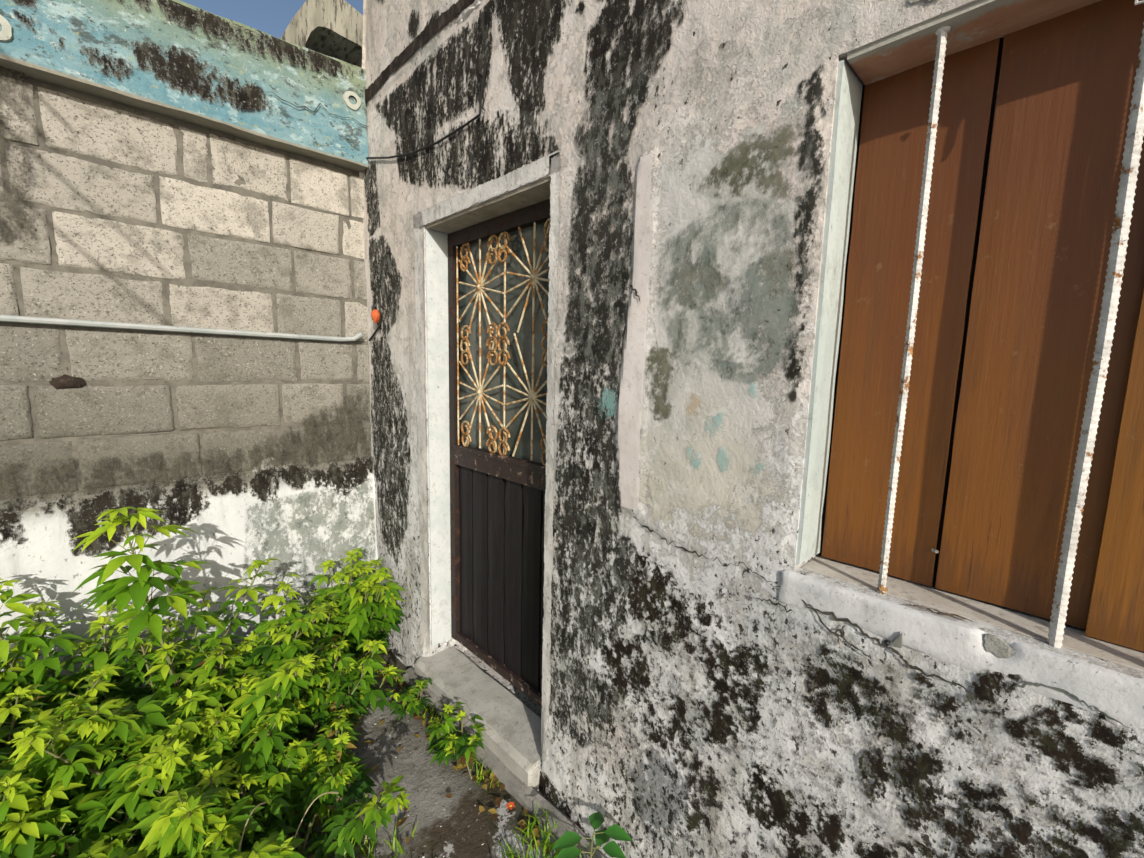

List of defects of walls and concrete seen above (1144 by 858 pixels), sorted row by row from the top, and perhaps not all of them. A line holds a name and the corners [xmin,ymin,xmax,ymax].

leakage [13,0,269,111]
leakage [118,0,364,78]
leakage [376,0,585,189]
leakage [0,394,377,613]
leakage [539,0,1144,858]
crack [633,516,977,695]
crack [1013,682,1133,729]